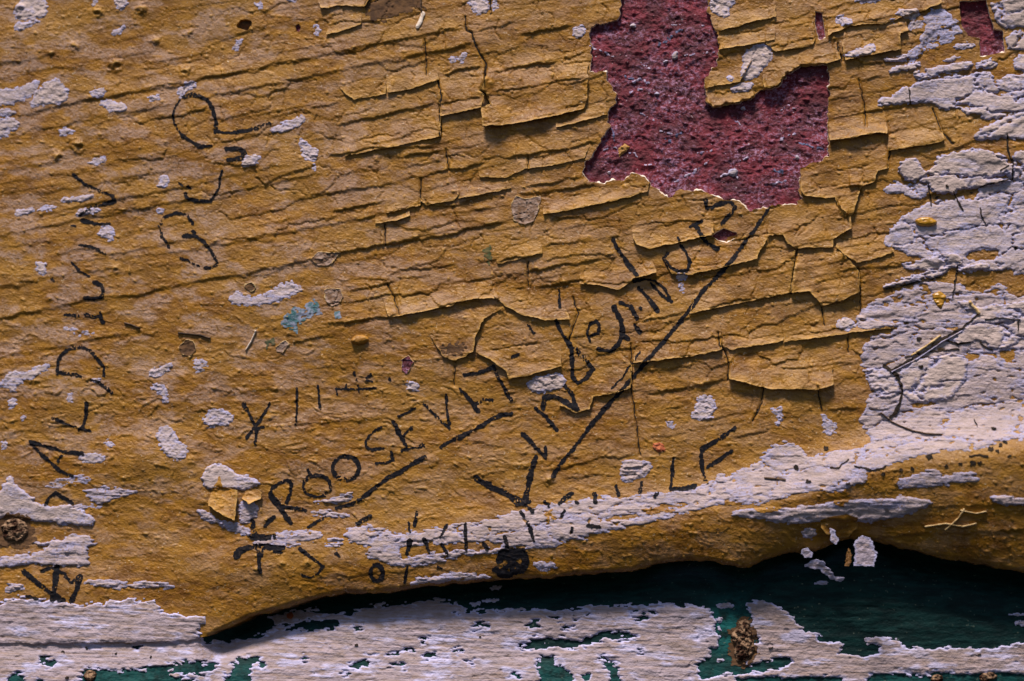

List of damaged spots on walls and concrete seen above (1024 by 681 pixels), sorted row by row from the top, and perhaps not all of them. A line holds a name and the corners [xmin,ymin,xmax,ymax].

crack [425,41,450,170]
crack [464,0,492,106]
crack [569,297,579,342]
peeling [197,0,1024,585]
crack [630,346,641,454]
crack [718,332,729,380]
peeling [0,439,138,568]
peeling [0,571,1024,681]